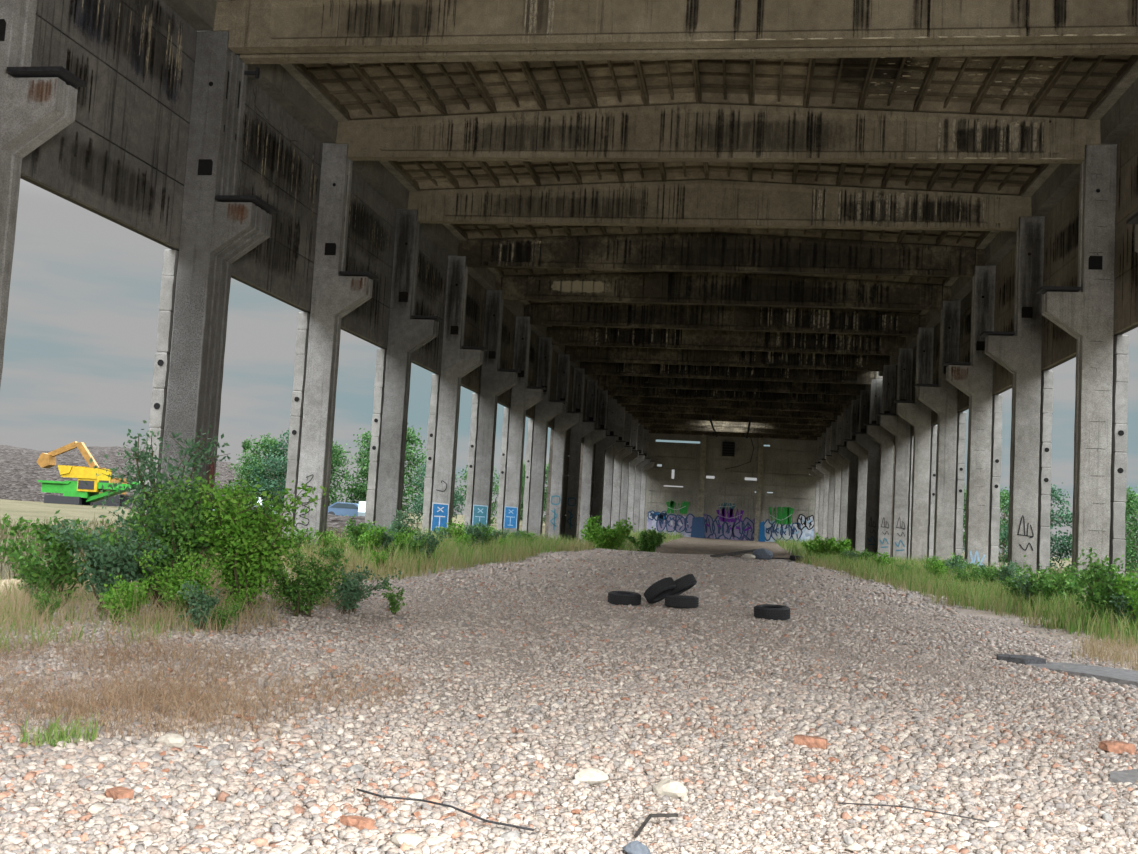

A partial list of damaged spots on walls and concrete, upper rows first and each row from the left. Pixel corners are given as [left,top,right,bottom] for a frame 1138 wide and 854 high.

leakage [524,0,554,35]
leakage [69,0,183,101]
leakage [442,119,517,151]
leakage [536,114,628,153]
leakage [660,109,740,151]
leakage [788,113,822,151]
leakage [938,119,1051,154]
leakage [539,274,910,399]